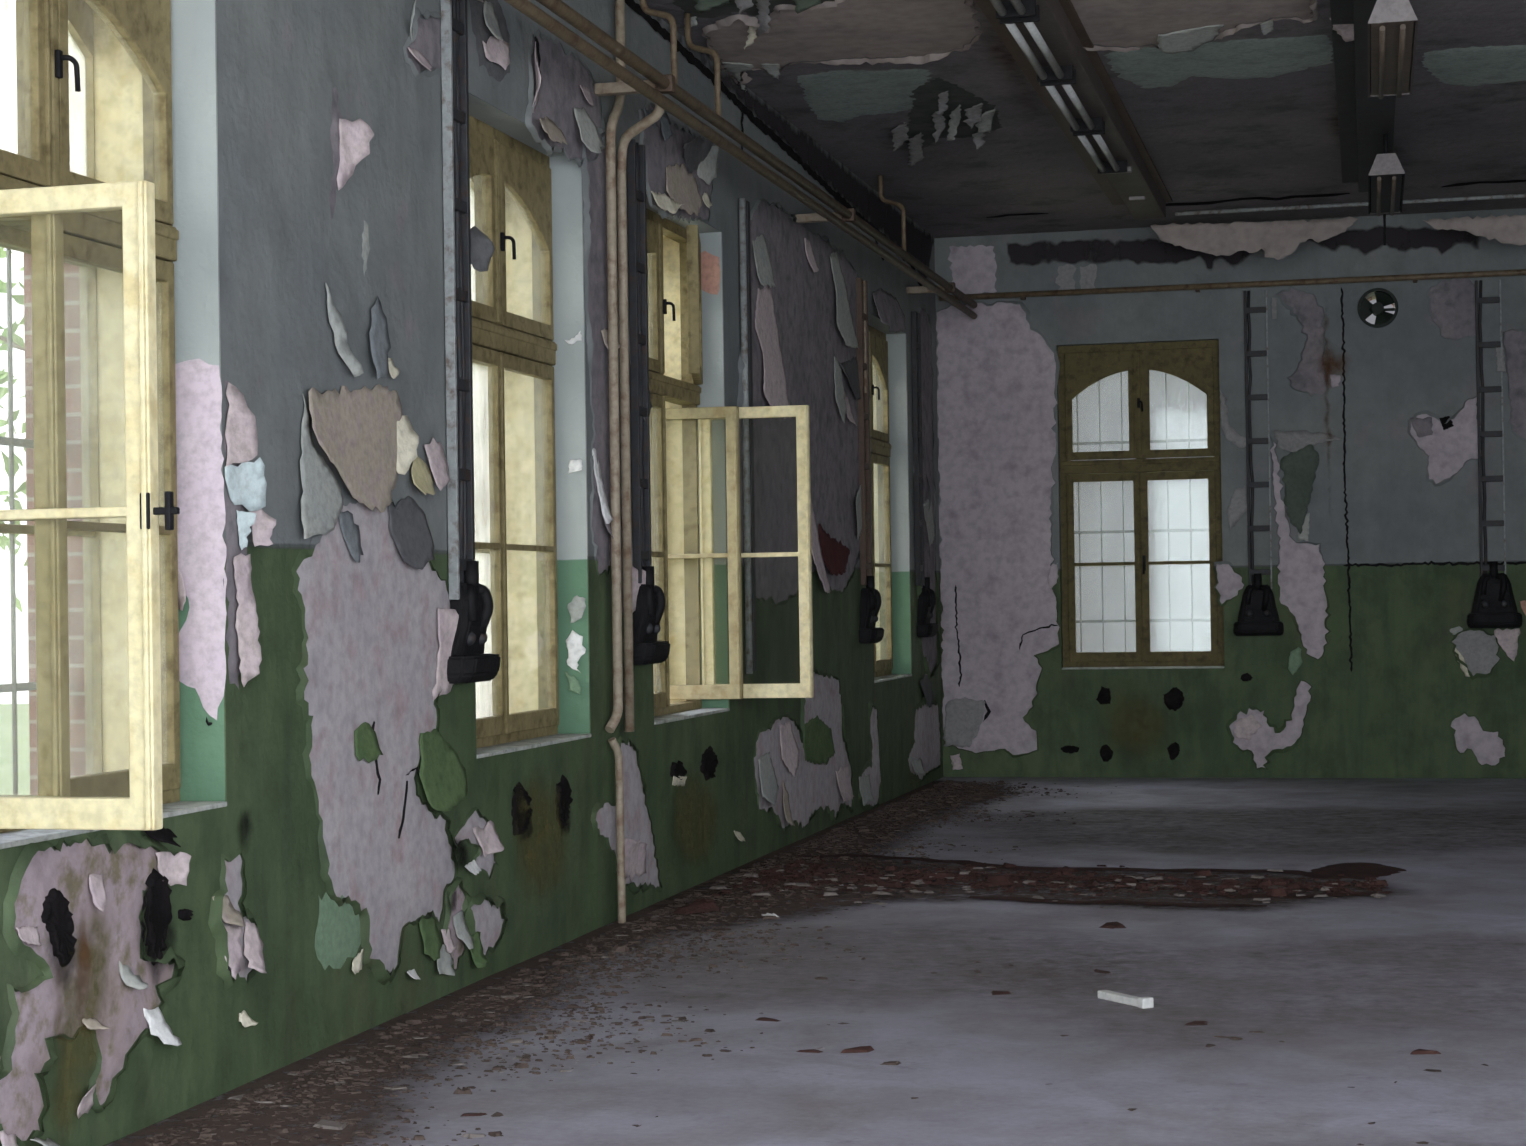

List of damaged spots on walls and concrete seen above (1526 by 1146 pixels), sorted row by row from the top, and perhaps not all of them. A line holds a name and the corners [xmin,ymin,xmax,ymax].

peeling [175,359,276,726]
peeling [329,87,374,220]
spalling [291,283,508,985]
peeling [565,595,586,695]
spalling [525,29,646,632]
spalling [753,669,882,832]
peeling [673,0,1002,167]
spalling [737,198,1062,782]
peeling [1150,216,1358,260]
spalling [1225,430,1342,770]
spalling [0,827,191,1146]
peeling [208,847,267,991]